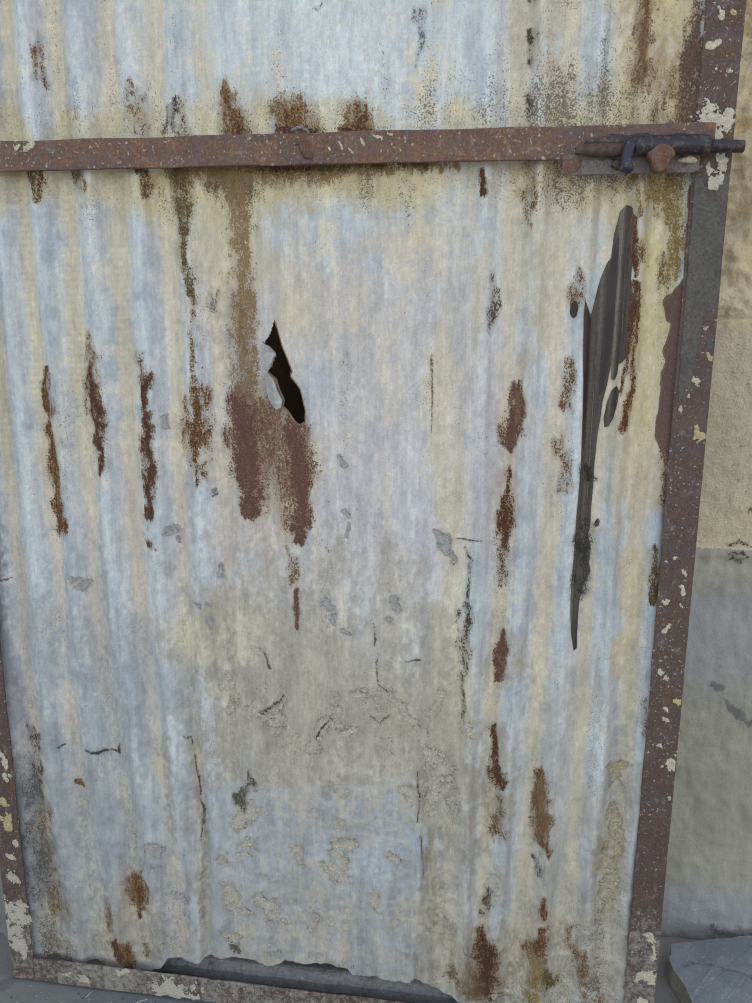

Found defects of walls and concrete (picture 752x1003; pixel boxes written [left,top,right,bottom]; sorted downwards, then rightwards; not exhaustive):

rust [213,76,386,135]
rust [629,0,706,123]
rust [39,365,69,537]
rust [84,331,109,477]
rust [137,352,158,524]
rust [164,162,461,630]
rust [493,379,527,589]
leakage [570,205,637,650]
peeling [215,799,263,867]
peeling [319,817,359,885]
peeling [304,687,394,755]
peeling [396,750,461,818]